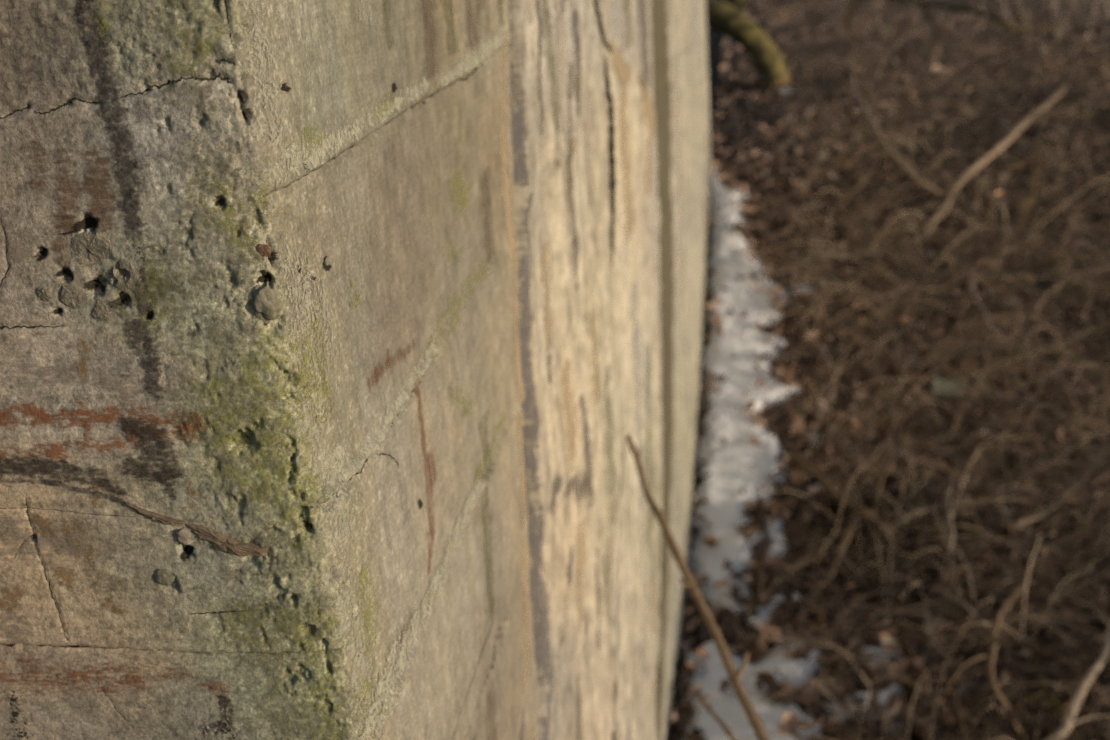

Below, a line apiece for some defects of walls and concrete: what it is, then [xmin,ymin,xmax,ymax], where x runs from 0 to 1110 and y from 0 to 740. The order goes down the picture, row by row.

crack [0,0,235,119]
damp [75,0,163,400]
damp [0,378,196,508]
corrosion [0,399,206,462]
corrosion [413,383,435,574]
damp [0,515,99,567]
crack [194,608,257,616]
damp [203,694,235,740]